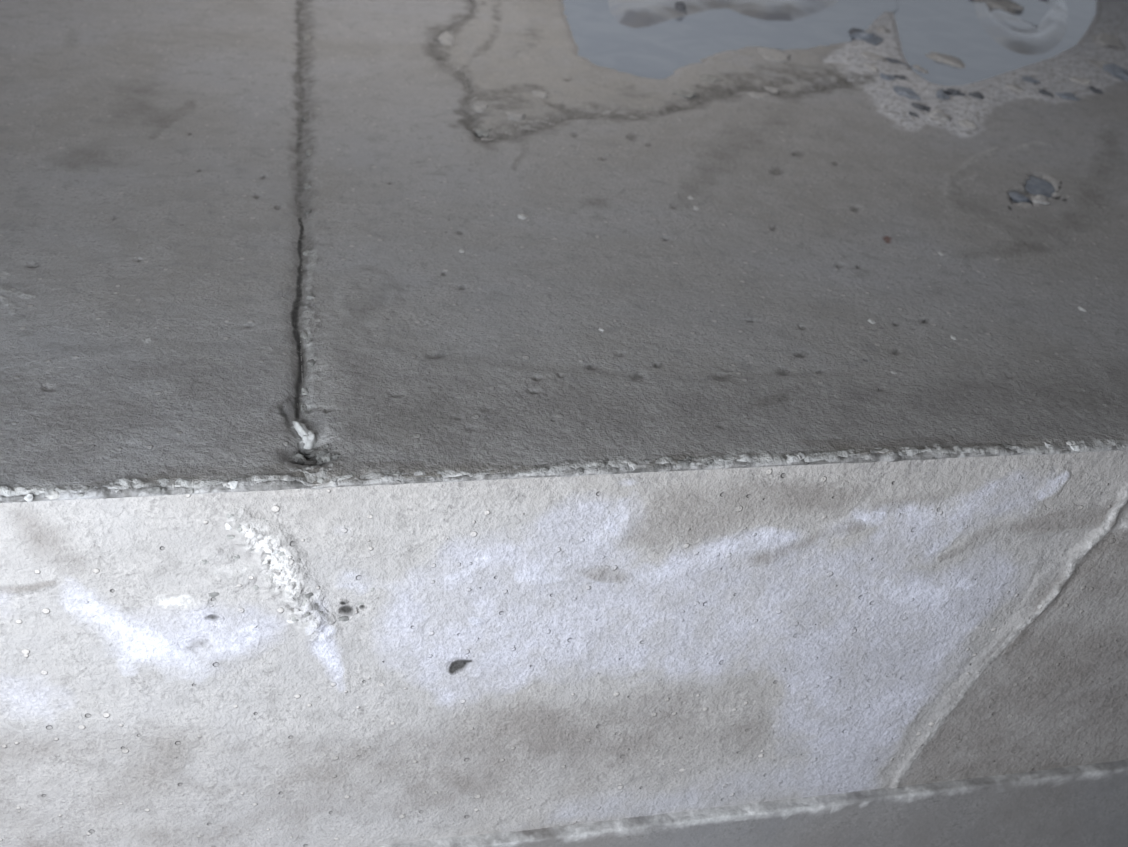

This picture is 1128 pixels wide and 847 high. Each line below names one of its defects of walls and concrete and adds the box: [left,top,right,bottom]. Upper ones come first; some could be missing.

peeling [412,0,884,154]
crack [281,0,327,439]
spalling [1000,171,1069,210]
crack [0,438,1128,503]